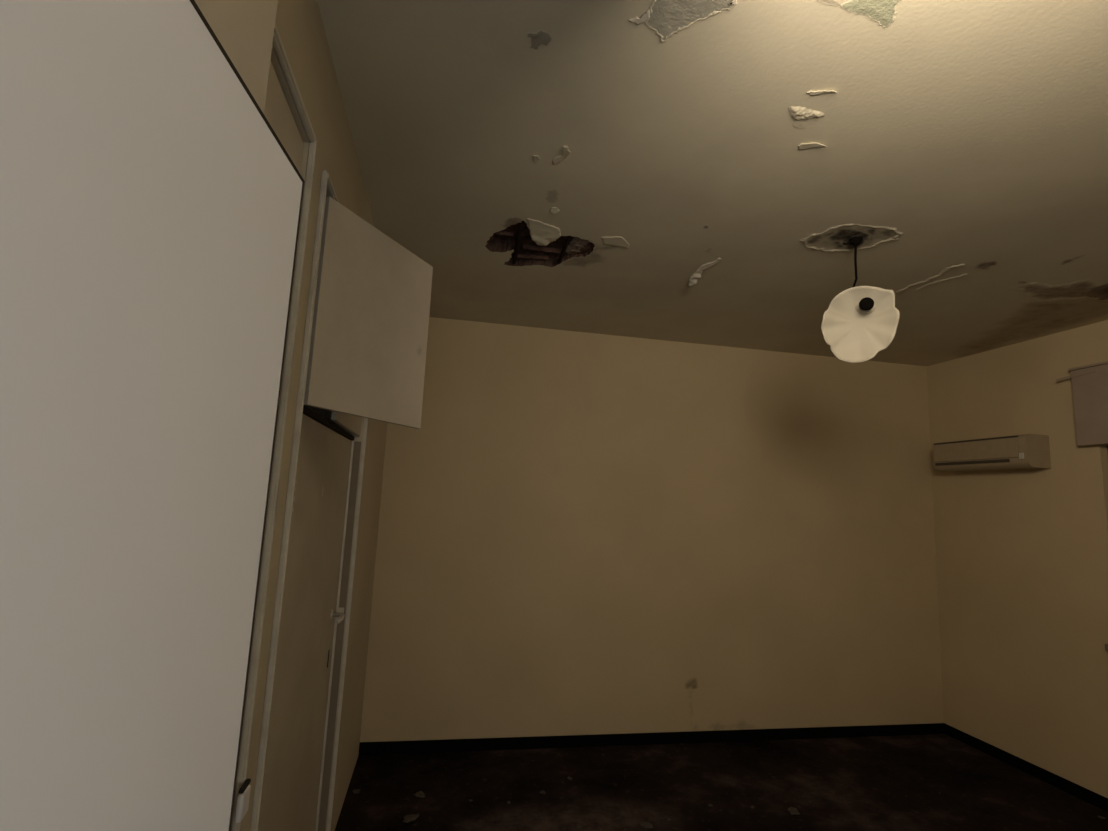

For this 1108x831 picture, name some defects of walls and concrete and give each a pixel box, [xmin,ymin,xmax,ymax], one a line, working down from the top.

peeling [629,0,739,43]
peeling [839,0,902,28]
spalling [485,217,630,270]
damp [942,297,1108,359]